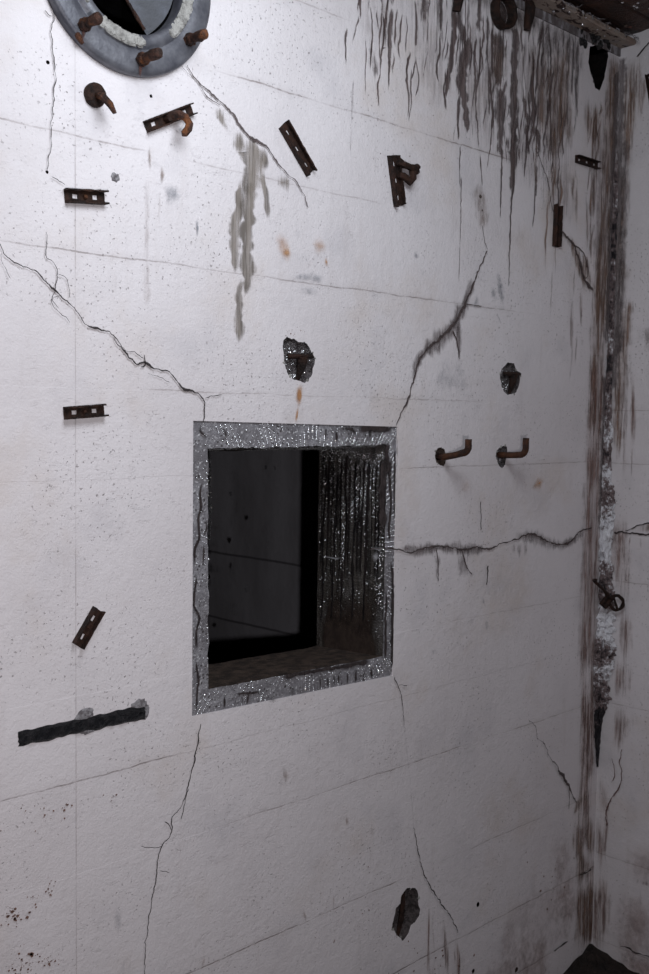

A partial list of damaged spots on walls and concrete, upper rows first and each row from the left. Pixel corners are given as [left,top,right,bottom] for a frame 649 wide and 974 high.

crack [183,65,308,207]
water stain [230,136,270,339]
crack [0,232,219,422]
spalling [283,333,316,383]
crack [396,226,487,425]
spalling [500,363,521,395]
water stain [345,0,644,941]
crack [369,522,649,581]
crack [532,722,576,803]
crack [141,724,201,974]
spalling [391,888,420,953]
crack [414,829,458,931]